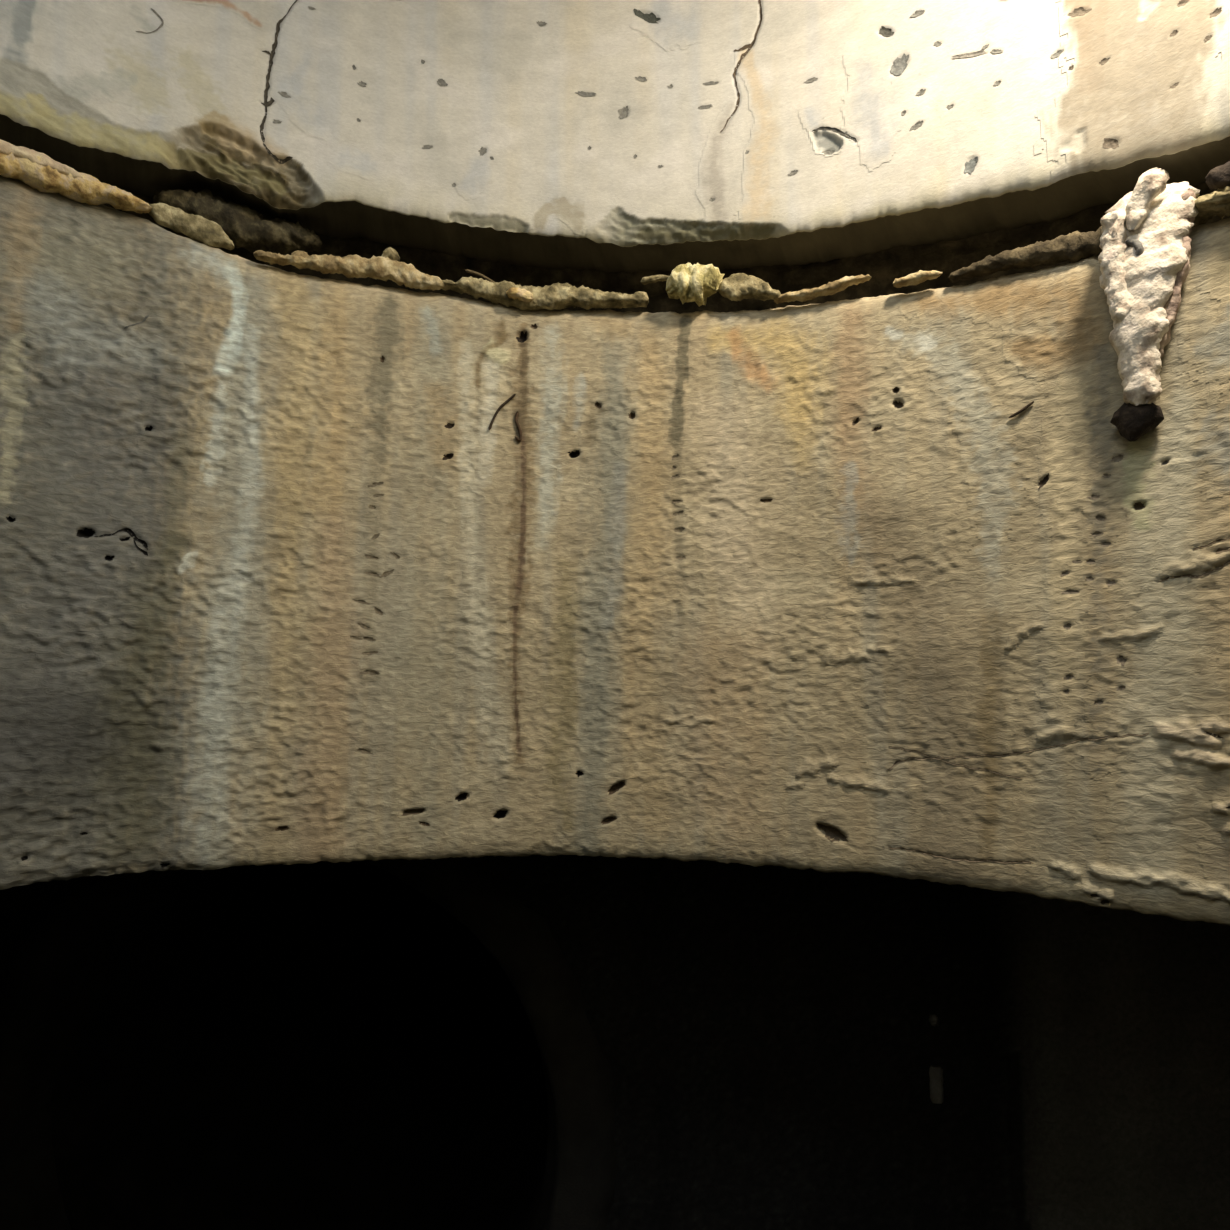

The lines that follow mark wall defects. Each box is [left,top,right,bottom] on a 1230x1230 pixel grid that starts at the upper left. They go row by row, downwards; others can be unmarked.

peeling [0,53,325,255]
crack [260,0,297,164]
crack [720,0,762,132]
water stain [1034,0,1230,183]
crack [1158,538,1230,582]
water stain [357,238,1230,1230]
crack [887,733,1149,779]
crack [889,847,1033,864]